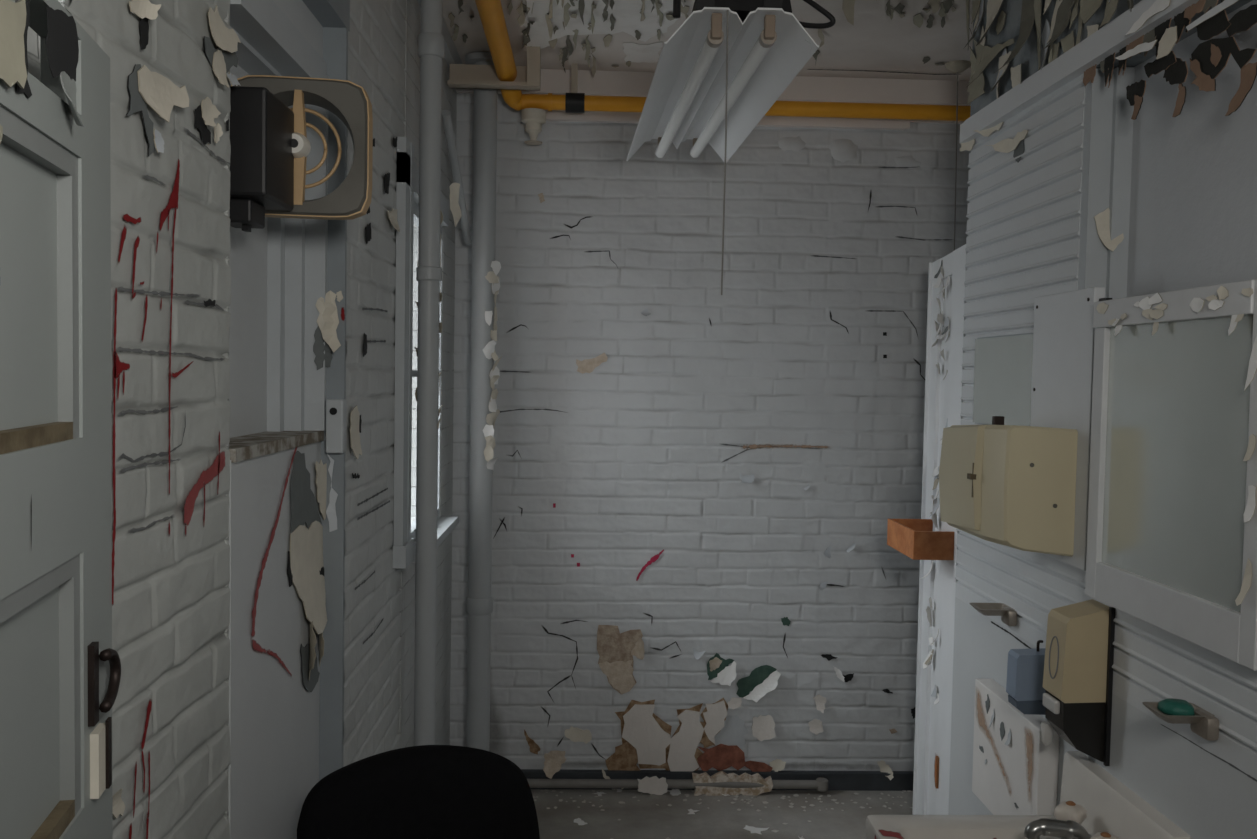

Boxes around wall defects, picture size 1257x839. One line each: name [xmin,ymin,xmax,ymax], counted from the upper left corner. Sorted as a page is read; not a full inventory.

peeling [0,0,32,98]
peeling [45,7,84,127]
peeling [129,0,161,49]
peeling [126,64,229,156]
peeling [204,5,241,88]
peeling [507,0,689,77]
peeling [876,0,1257,120]
peeling [313,291,343,370]
crack [722,444,820,462]
peeling [287,450,338,692]
crack [541,620,587,746]
spalling [597,625,786,796]